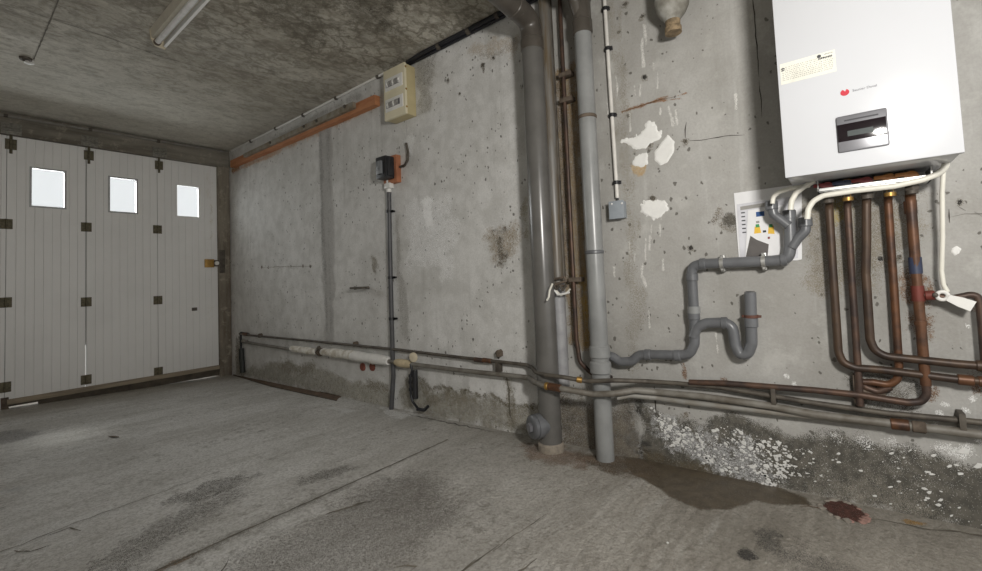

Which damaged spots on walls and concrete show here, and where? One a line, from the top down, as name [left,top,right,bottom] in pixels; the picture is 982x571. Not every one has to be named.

leakage [482,196,530,267]
crack [142,371,518,571]
crack [461,513,548,571]
leakage [235,336,982,529]